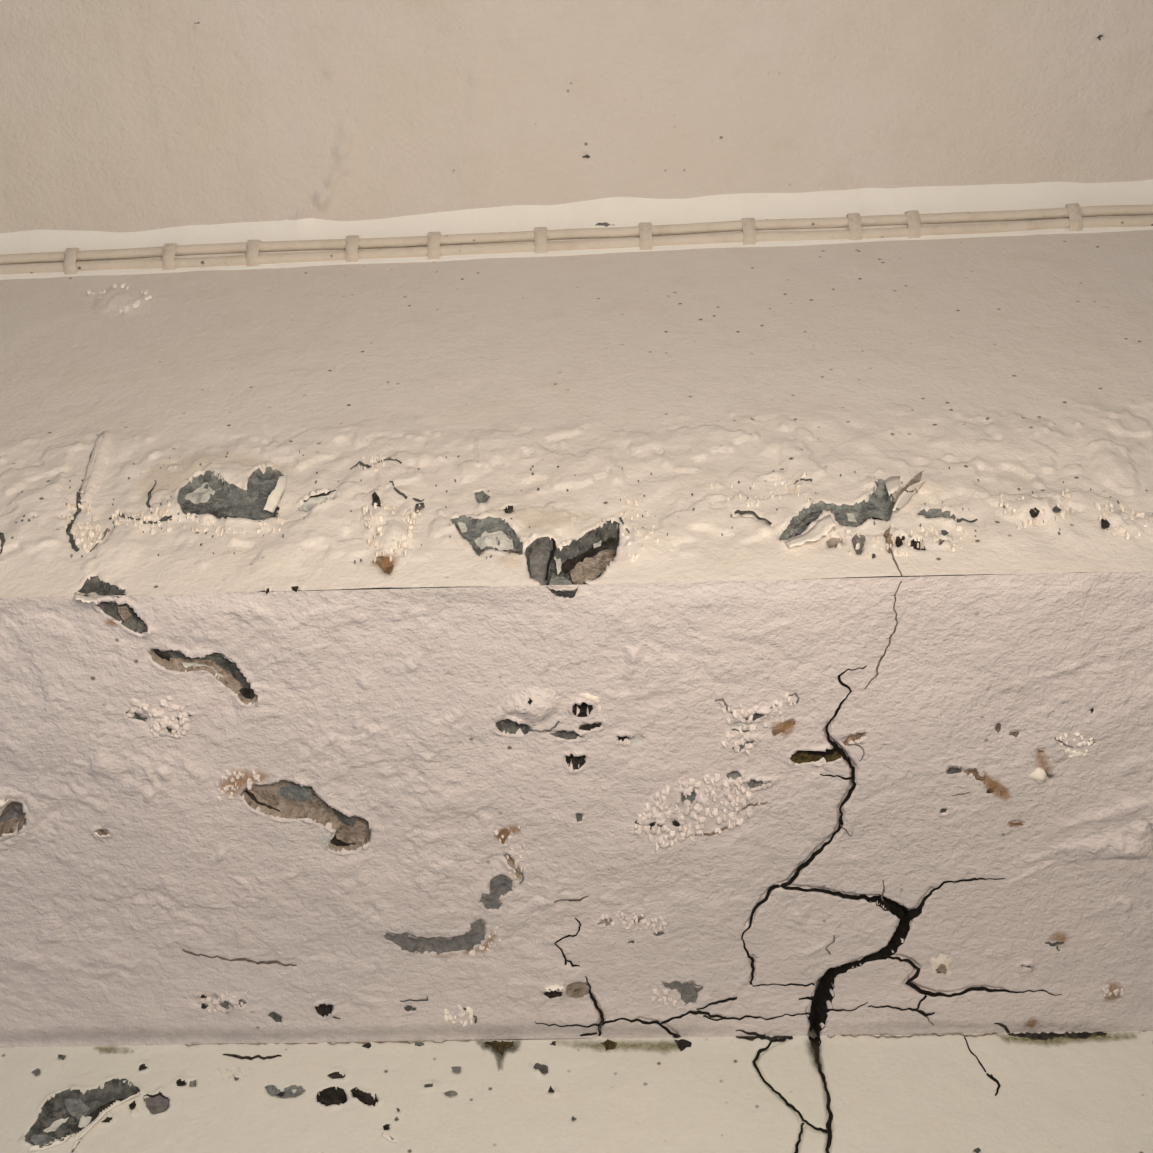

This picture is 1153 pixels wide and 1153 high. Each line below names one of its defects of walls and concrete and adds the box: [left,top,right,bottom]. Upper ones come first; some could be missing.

spalling [61,450,304,558]
spalling [435,479,668,598]
spalling [721,470,977,558]
spalling [75,576,148,634]
spalling [149,649,258,706]
peeling [490,686,602,740]
spalling [216,768,372,852]
crack [535,548,1062,1153]
crack [182,949,297,966]
peeling [384,874,513,958]
crack [223,1053,282,1061]
spalling [24,1078,170,1153]